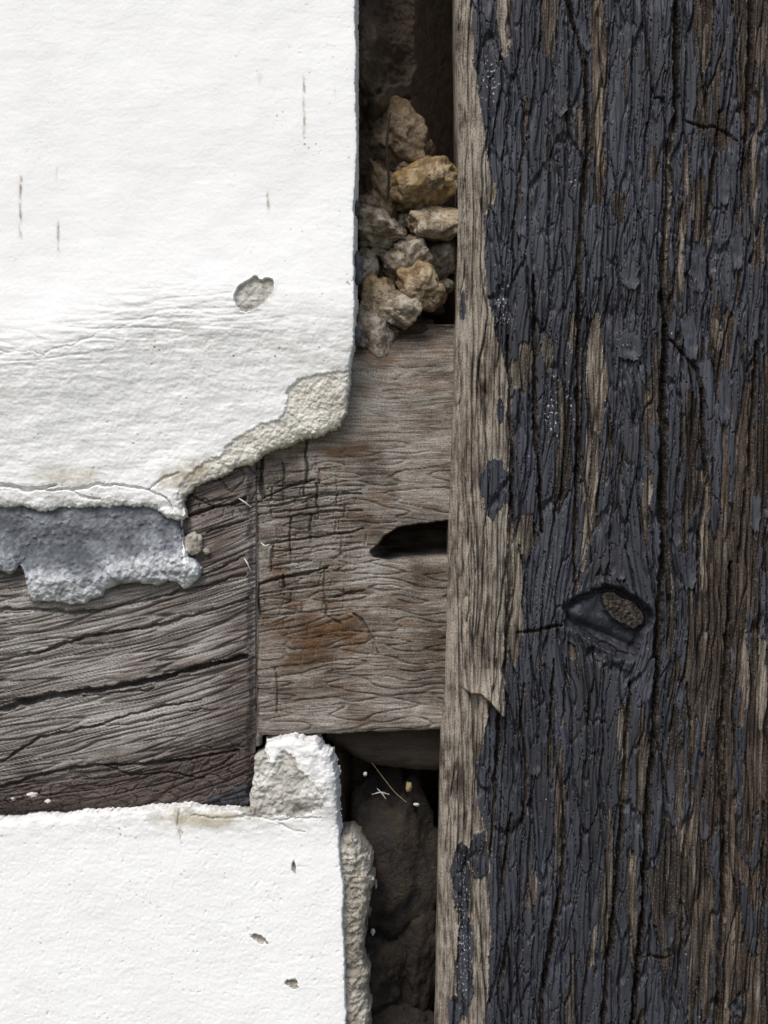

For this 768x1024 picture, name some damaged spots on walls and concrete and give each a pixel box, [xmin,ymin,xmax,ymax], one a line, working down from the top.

peeling [235,277,274,312]
spalling [0,371,352,605]
crack [0,439,380,662]
peeling [448,0,768,1024]
crack [0,654,249,789]
spalling [239,745,324,821]